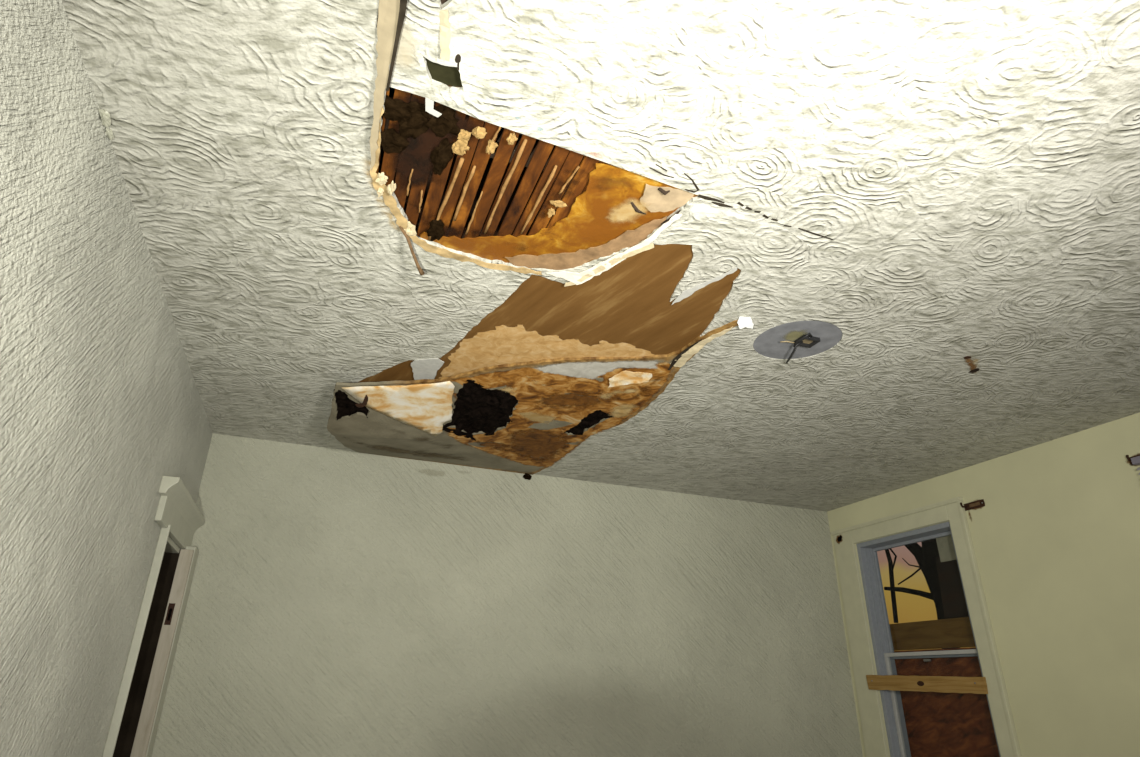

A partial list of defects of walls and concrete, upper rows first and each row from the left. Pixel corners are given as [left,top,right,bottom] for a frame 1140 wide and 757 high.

peeling [370,0,407,171]
peeling [439,10,461,70]
crack [650,164,833,240]
peeling [350,230,741,383]
peeling [737,317,754,329]
water stain [359,362,673,468]